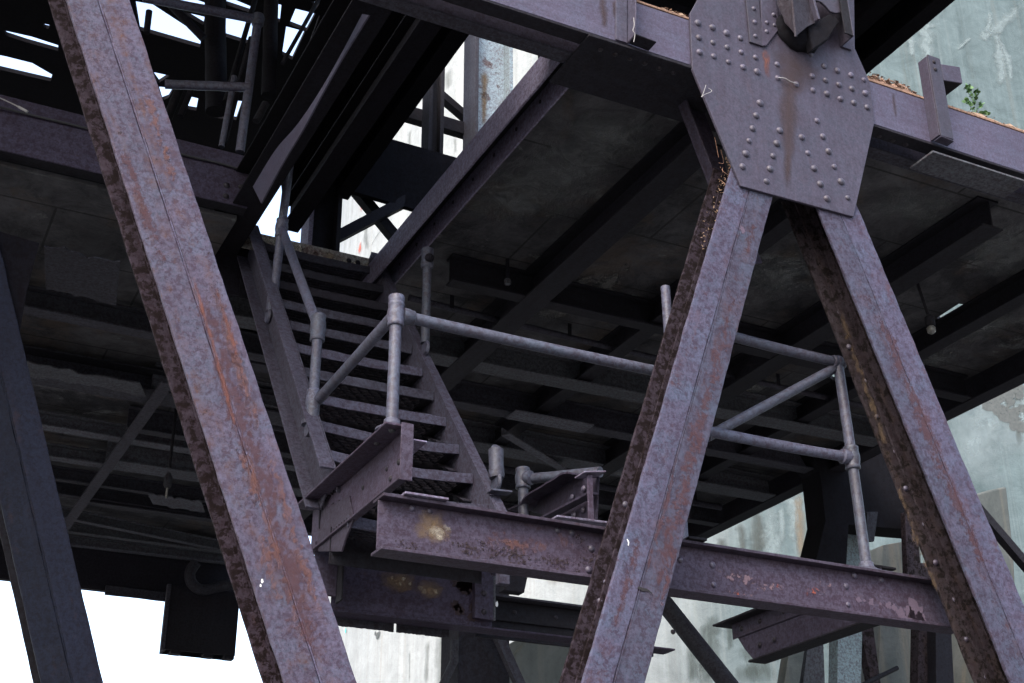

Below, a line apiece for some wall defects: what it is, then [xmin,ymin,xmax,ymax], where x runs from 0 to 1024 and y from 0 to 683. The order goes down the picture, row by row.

rust [479,58,500,122]
rust [121,153,166,261]
rust [196,291,321,647]
rust [614,315,737,623]
rust [868,296,987,563]
peeling [720,571,786,596]
peeling [856,596,926,626]
rust [898,490,936,587]